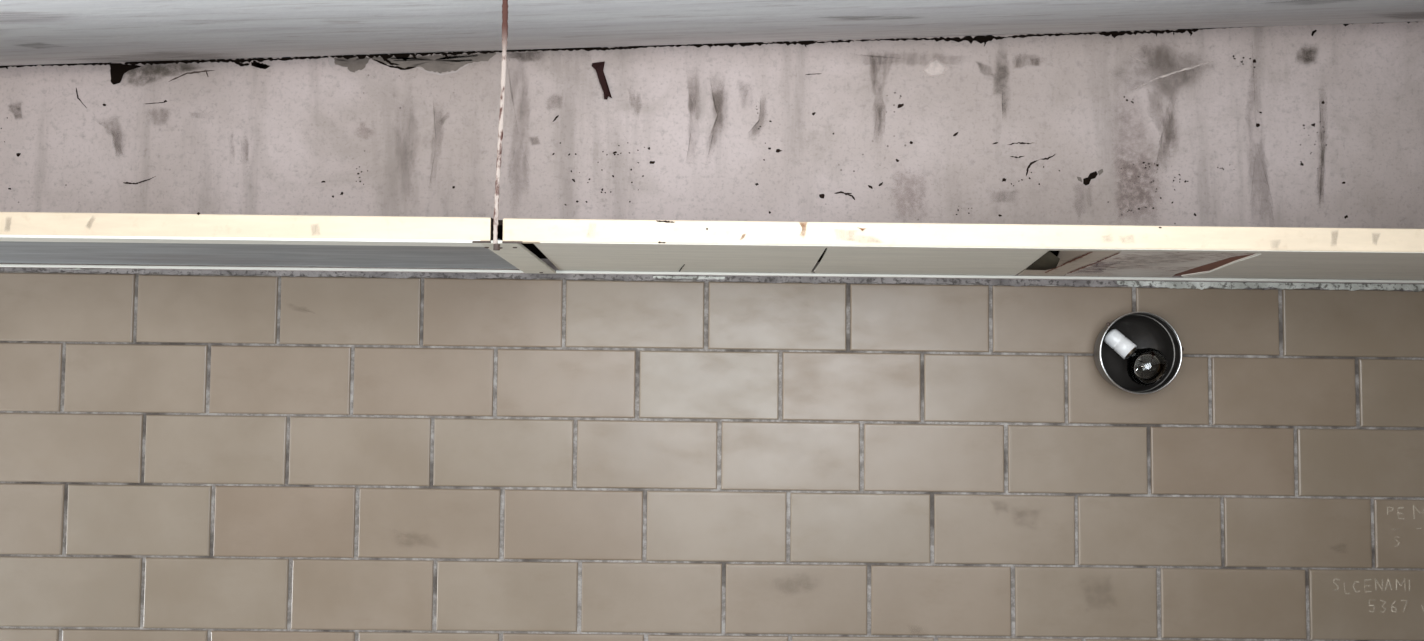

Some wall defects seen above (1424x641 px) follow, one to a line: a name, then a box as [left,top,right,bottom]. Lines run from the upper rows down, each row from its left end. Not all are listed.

peeling [110,63,214,85]
peeling [328,52,496,75]